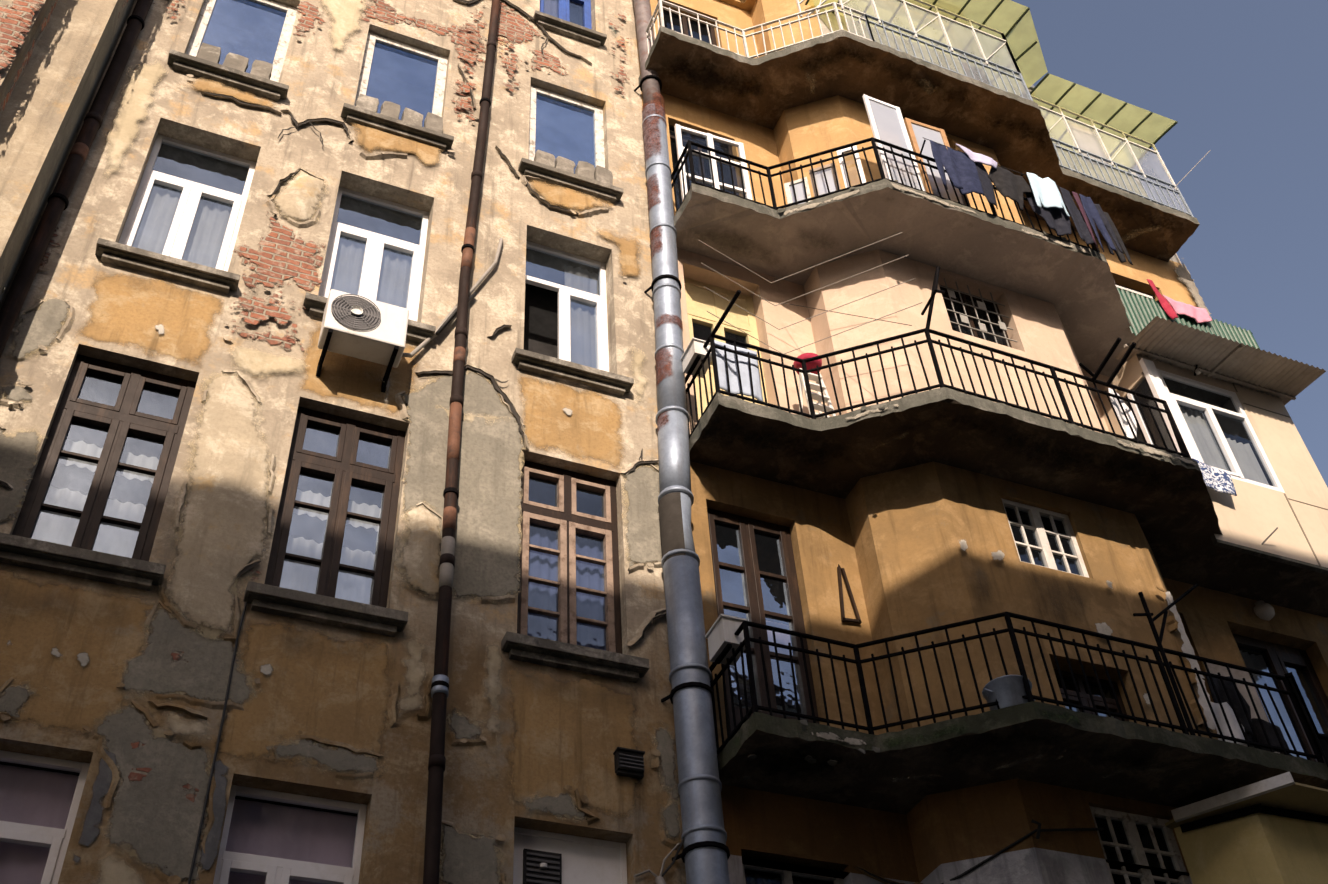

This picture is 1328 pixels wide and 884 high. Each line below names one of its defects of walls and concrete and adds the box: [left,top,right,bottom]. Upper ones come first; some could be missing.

flaking render [0,0,45,80]
flaking render [293,1,325,41]
flaking render [360,0,568,124]
crack [453,0,592,65]
crack [202,92,354,146]
crack [266,168,300,196]
crack [495,146,579,216]
flaking render [223,211,326,351]
peeling [0,424,42,521]
peeling [395,371,526,605]
flaking render [1156,586,1217,734]
peeling [82,599,273,884]